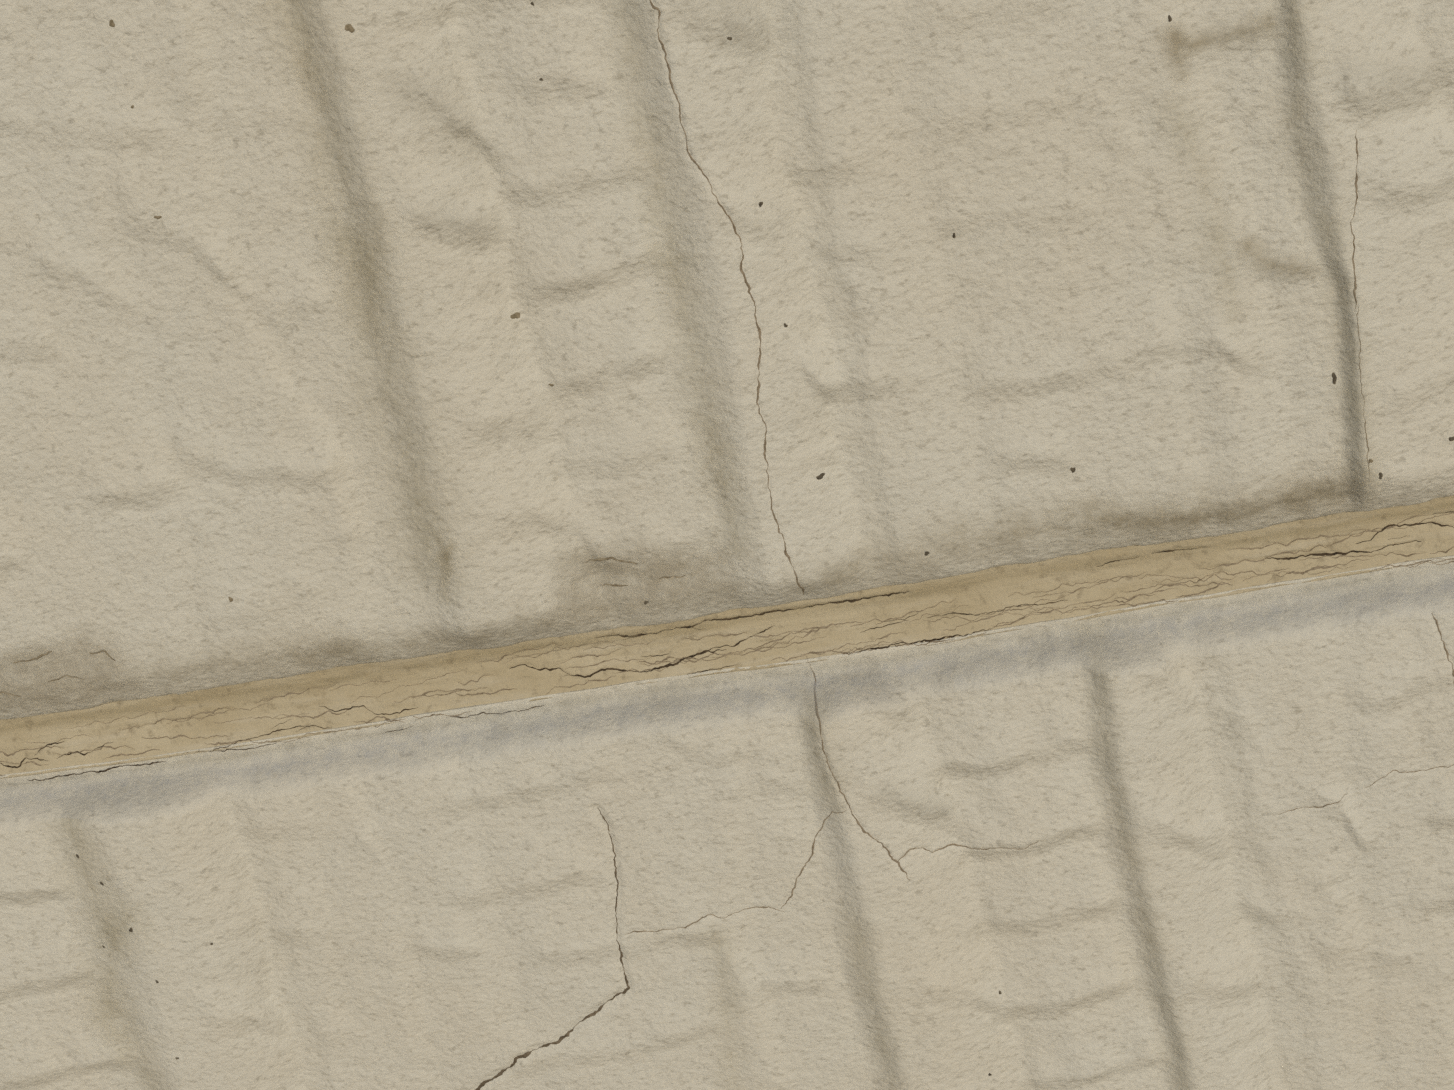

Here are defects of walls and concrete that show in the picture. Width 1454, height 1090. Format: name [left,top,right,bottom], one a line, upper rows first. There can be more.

crack [0,670,544,781]
crack [475,0,1454,1090]